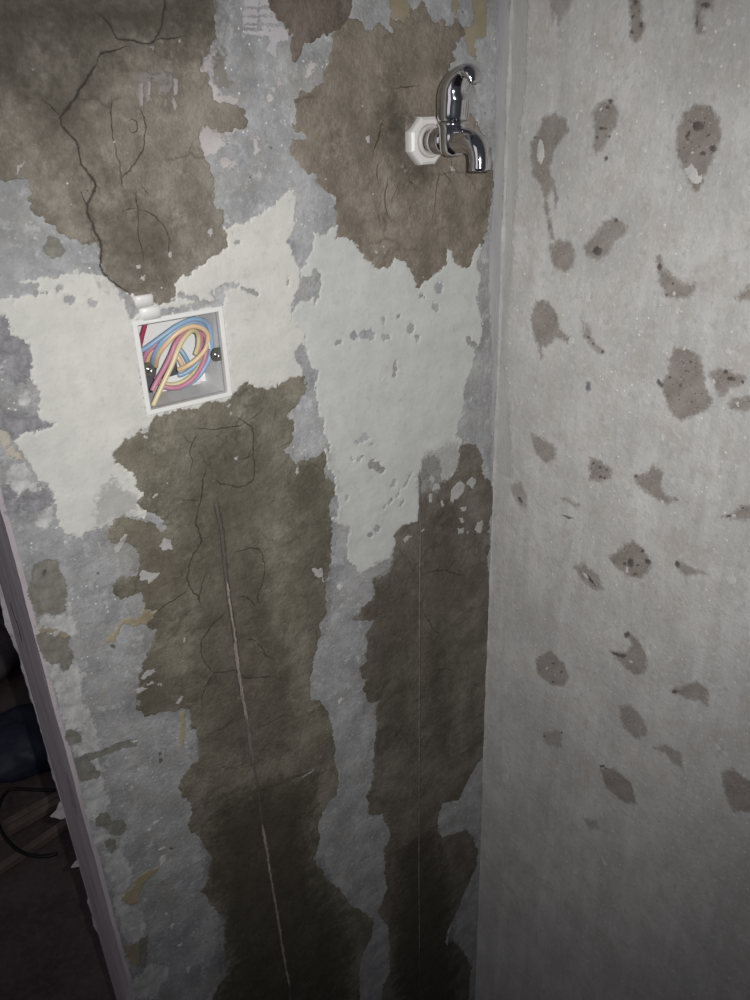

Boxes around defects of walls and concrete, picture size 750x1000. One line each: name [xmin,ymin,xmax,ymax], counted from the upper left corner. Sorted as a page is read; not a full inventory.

leakage [212,46,232,88]
crack [50,4,179,292]
peeling [0,0,272,305]
leakage [532,114,573,271]
leakage [678,105,720,190]
leakage [532,300,575,356]
leakage [657,345,744,420]
leakage [611,541,650,577]
crack [158,414,291,1000]
peeling [105,376,493,1000]
peeling [50,801,65,820]
leakage [212,783,350,1000]